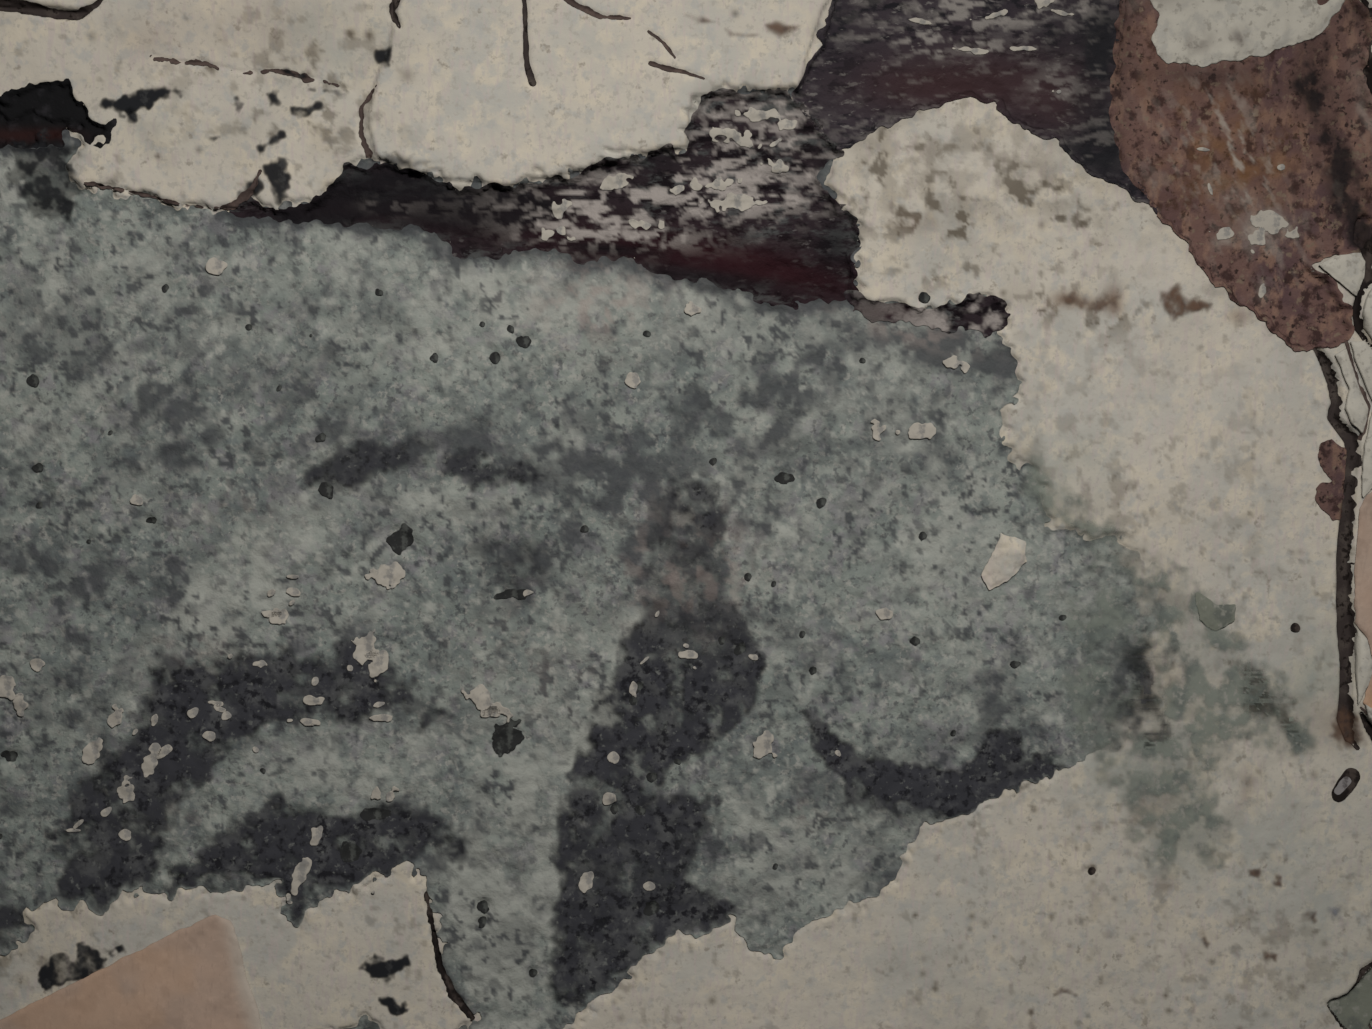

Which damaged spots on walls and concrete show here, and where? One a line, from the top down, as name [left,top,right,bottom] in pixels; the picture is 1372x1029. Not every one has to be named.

crack [0,0,103,20]
crack [522,0,536,86]
crack [565,0,705,79]
spalling [788,0,1372,352]
corrosion [1162,286,1210,317]
peeling [0,78,1163,1029]
peeling [1195,592,1236,631]
damp [47,640,464,920]
damp [551,614,765,1006]
damp [805,711,1061,817]
damp [361,955,410,1015]
crack [424,891,475,1020]